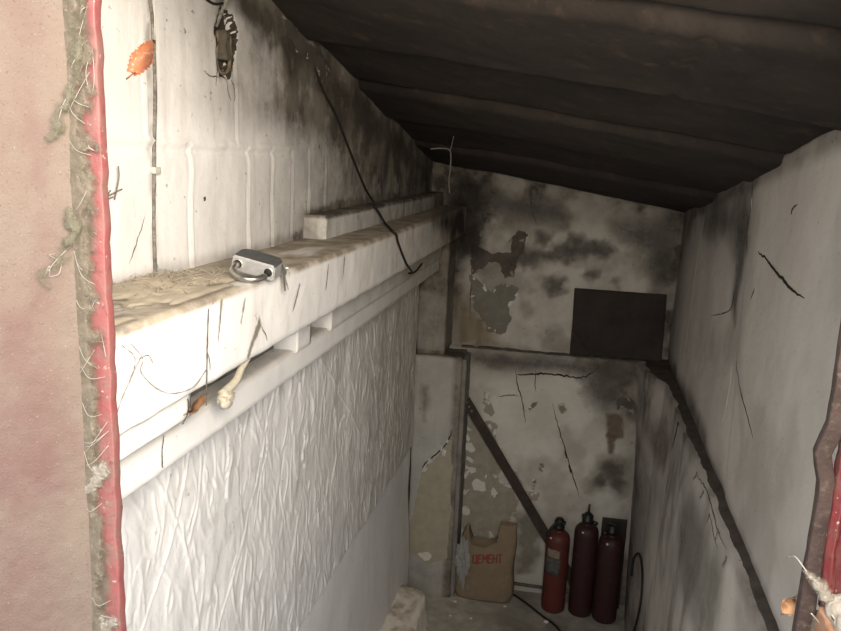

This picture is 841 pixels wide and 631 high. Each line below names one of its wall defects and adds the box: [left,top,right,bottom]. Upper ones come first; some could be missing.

peeling [469,230,528,335]
damp [516,234,614,266]
crack [758,251,804,298]
crack [498,365,601,417]
spalling [410,391,544,564]
crack [553,407,580,498]